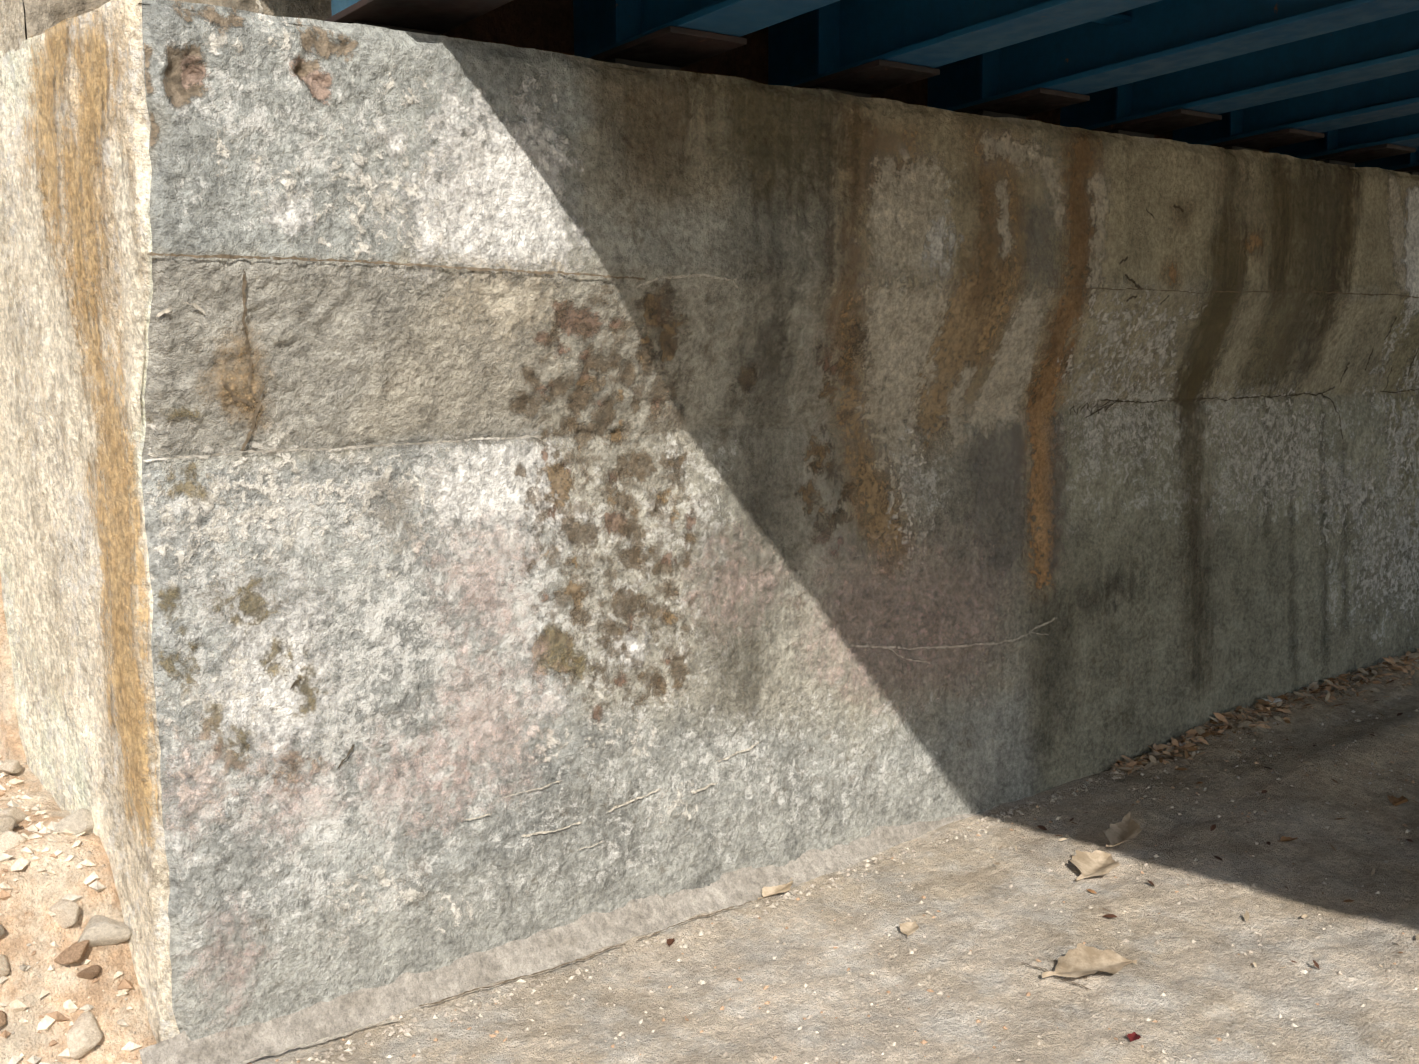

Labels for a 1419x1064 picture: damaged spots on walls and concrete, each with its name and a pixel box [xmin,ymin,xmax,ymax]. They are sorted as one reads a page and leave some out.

efflorescence [980,131,1066,258]
corrosion [915,136,1022,445]
corrosion [22,13,158,844]
corrosion [1024,135,1102,589]
crack [1101,386,1343,439]
damp [1058,148,1419,679]
damp [513,635,686,763]
damp [649,784,698,824]
damp [322,865,473,944]